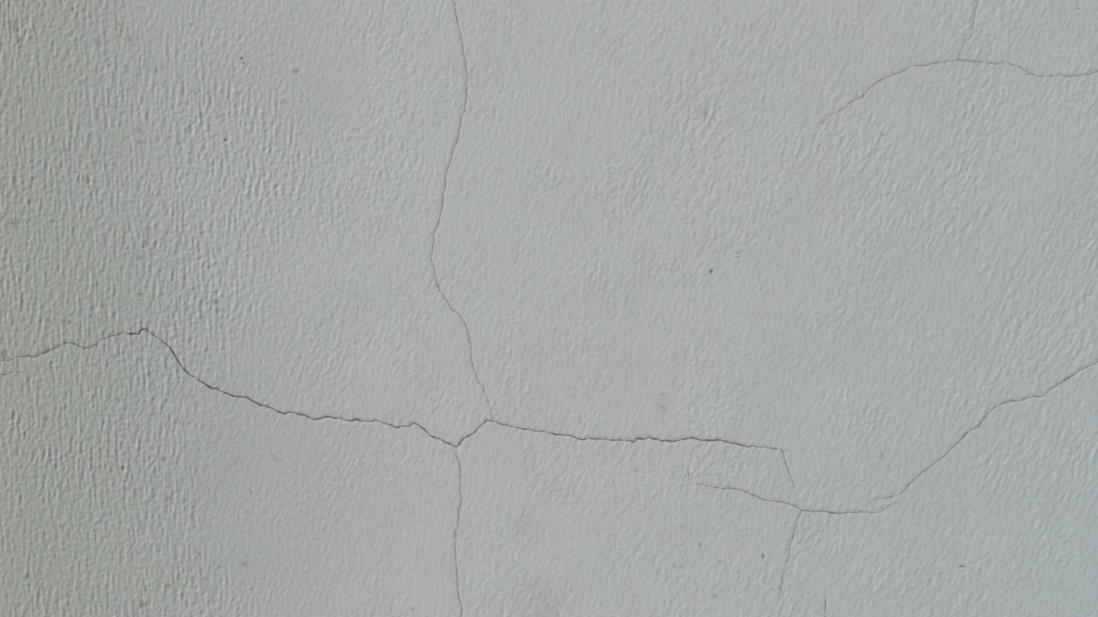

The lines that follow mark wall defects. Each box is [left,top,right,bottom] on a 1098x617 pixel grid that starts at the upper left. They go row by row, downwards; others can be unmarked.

crack [167,345,361,421]